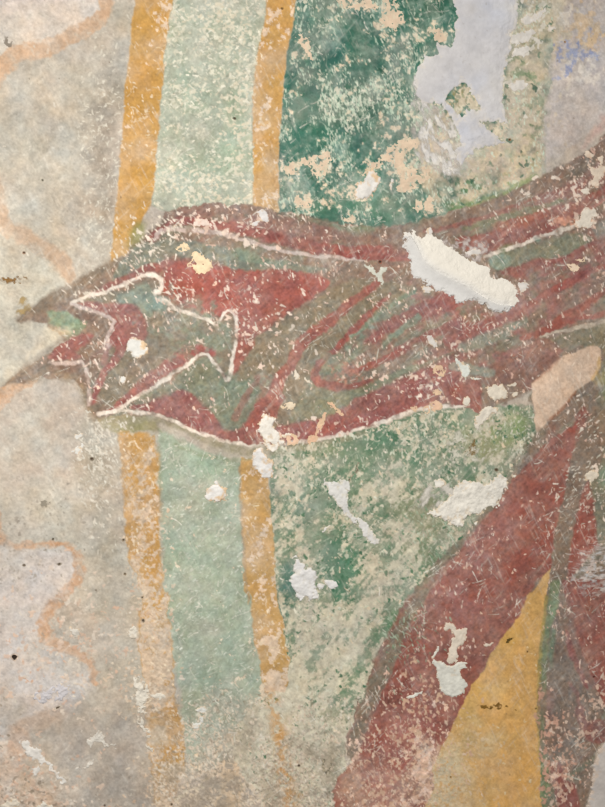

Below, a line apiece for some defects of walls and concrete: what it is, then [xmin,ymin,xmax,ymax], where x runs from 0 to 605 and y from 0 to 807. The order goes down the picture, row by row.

peeling [336,0,406,32]
flaking render [414,0,546,166]
flaking render [579,151,605,194]
flaking render [574,207,598,229]
flaking render [251,402,344,479]
peeling [312,580,338,599]
flaking render [432,622,467,664]